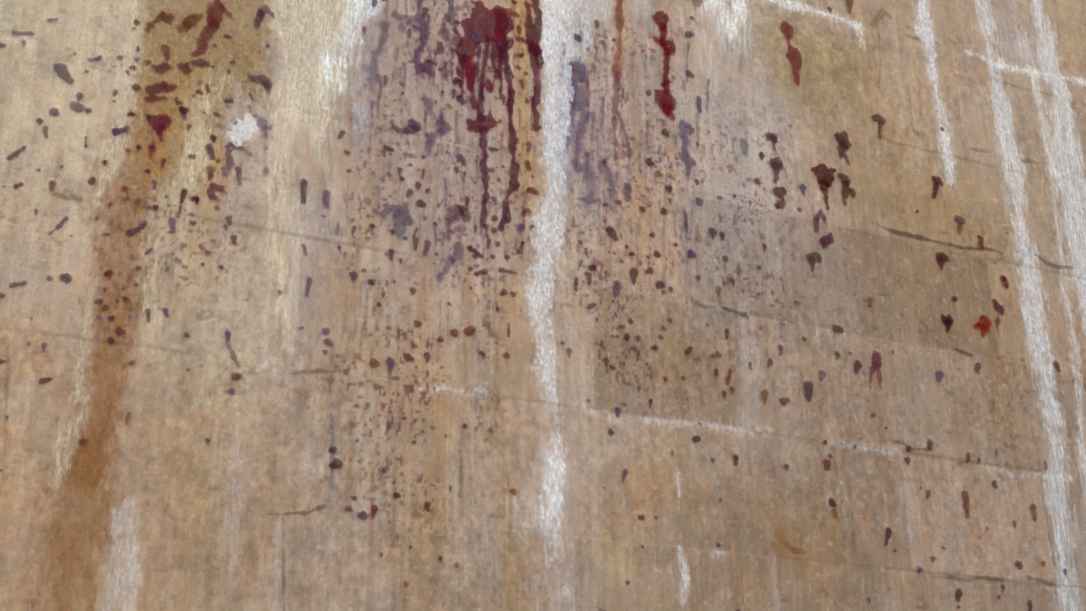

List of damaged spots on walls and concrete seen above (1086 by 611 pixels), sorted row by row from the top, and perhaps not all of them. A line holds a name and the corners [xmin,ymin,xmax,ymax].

damp [780,21,802,85]
damp [37,63,91,137]
damp [932,127,953,198]
damp [806,131,856,272]
damp [46,0,385,491]
damp [588,226,673,342]
damp [370,353,431,374]
damp [437,326,476,343]
damp [711,351,734,398]
damp [973,299,1005,337]
damp [345,496,378,520]